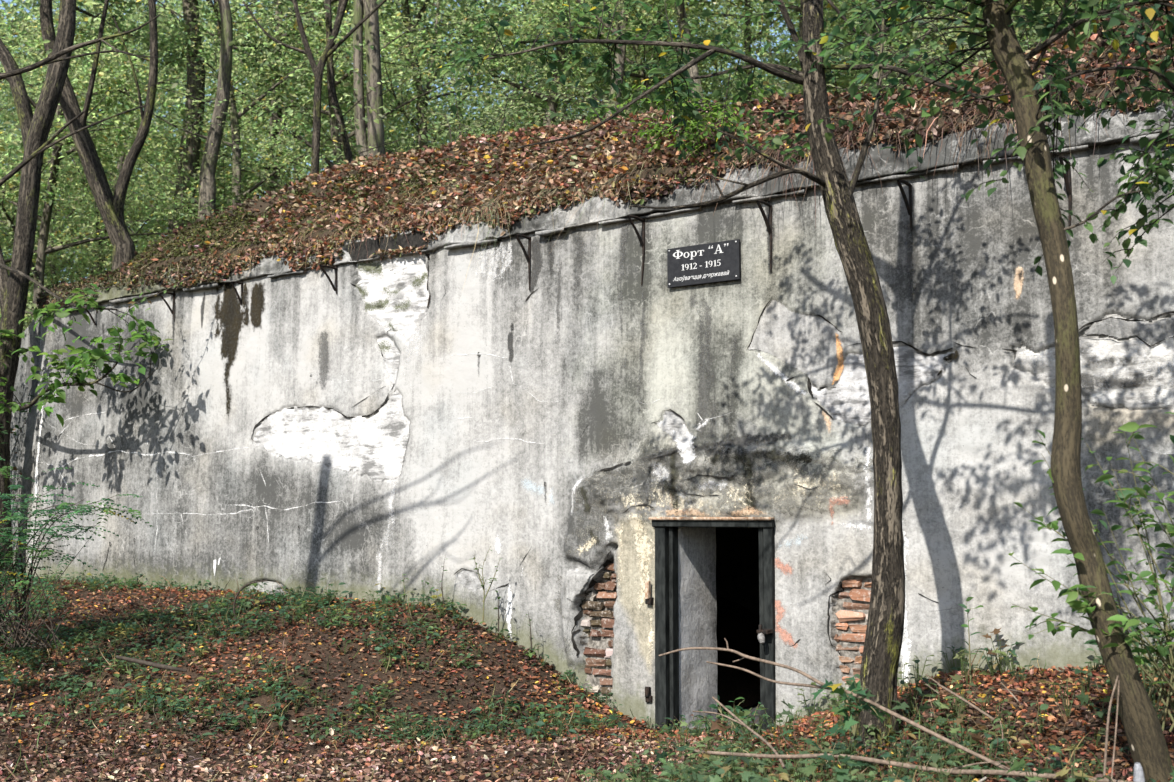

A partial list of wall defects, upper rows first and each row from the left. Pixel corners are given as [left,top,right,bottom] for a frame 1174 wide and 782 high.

flaking render [347,232,431,342]
damp [200,281,265,417]
flaking render [746,300,871,429]
flaking render [892,341,958,407]
flaking render [1003,346,1055,387]
flaking render [1079,311,1174,411]
damp [35,386,44,500]
flaking render [251,386,410,482]
flaking render [652,409,708,463]
flaking render [571,548,617,701]
flaking render [825,576,872,688]